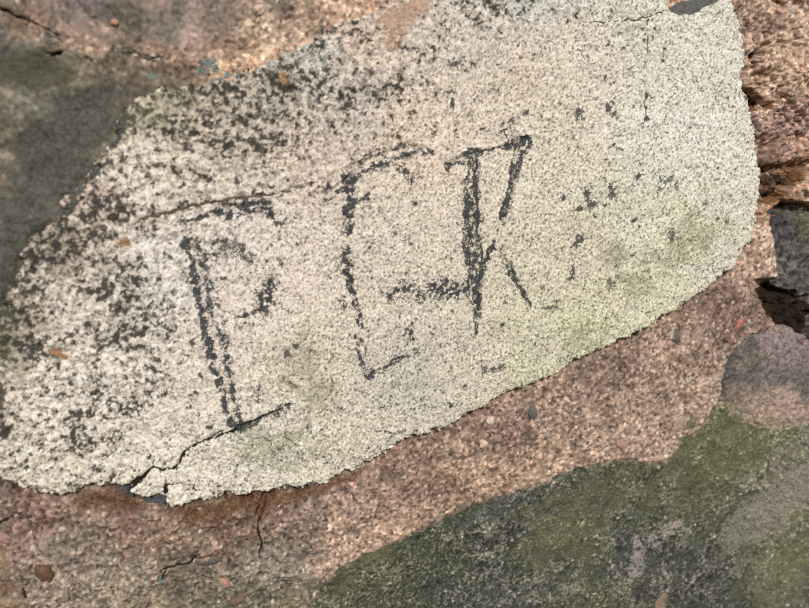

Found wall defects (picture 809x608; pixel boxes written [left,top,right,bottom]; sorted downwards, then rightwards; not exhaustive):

crack [0,8,111,74]
crack [129,403,302,494]
crack [257,491,266,557]